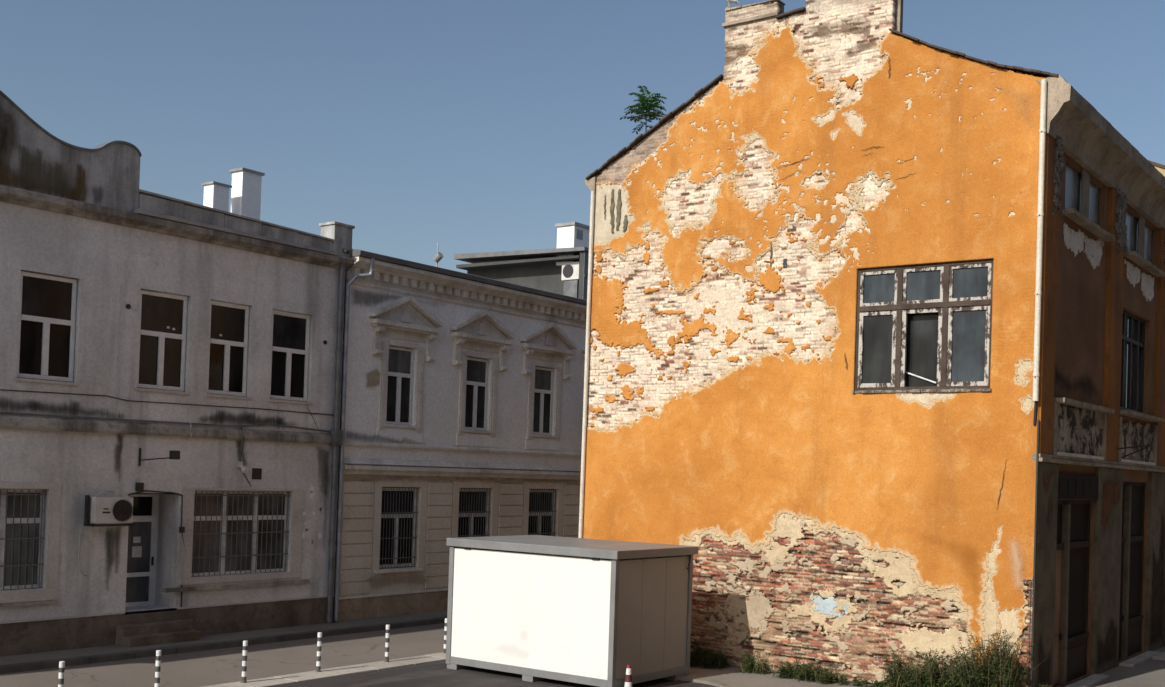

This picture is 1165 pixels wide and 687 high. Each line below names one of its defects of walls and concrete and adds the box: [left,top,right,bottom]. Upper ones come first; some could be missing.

leakage [0,109,69,191]
peeling [587,0,908,432]
peeling [1063,223,1104,269]
peeling [1124,259,1154,302]
peeling [682,511,1033,687]